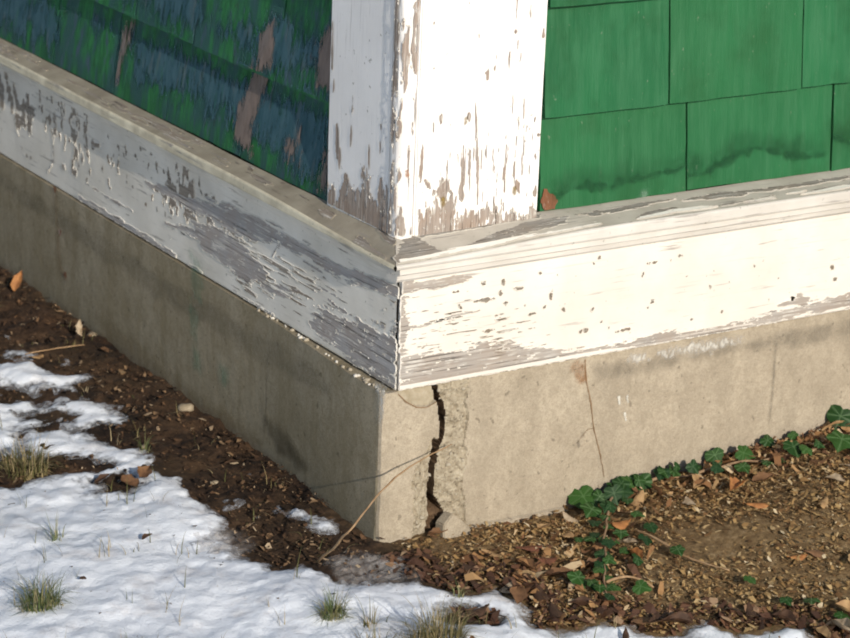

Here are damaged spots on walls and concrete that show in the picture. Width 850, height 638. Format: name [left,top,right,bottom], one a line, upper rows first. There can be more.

peeling [0,0,850,264]
peeling [0,71,850,537]
crack [424,384,447,531]
crack [578,360,604,476]